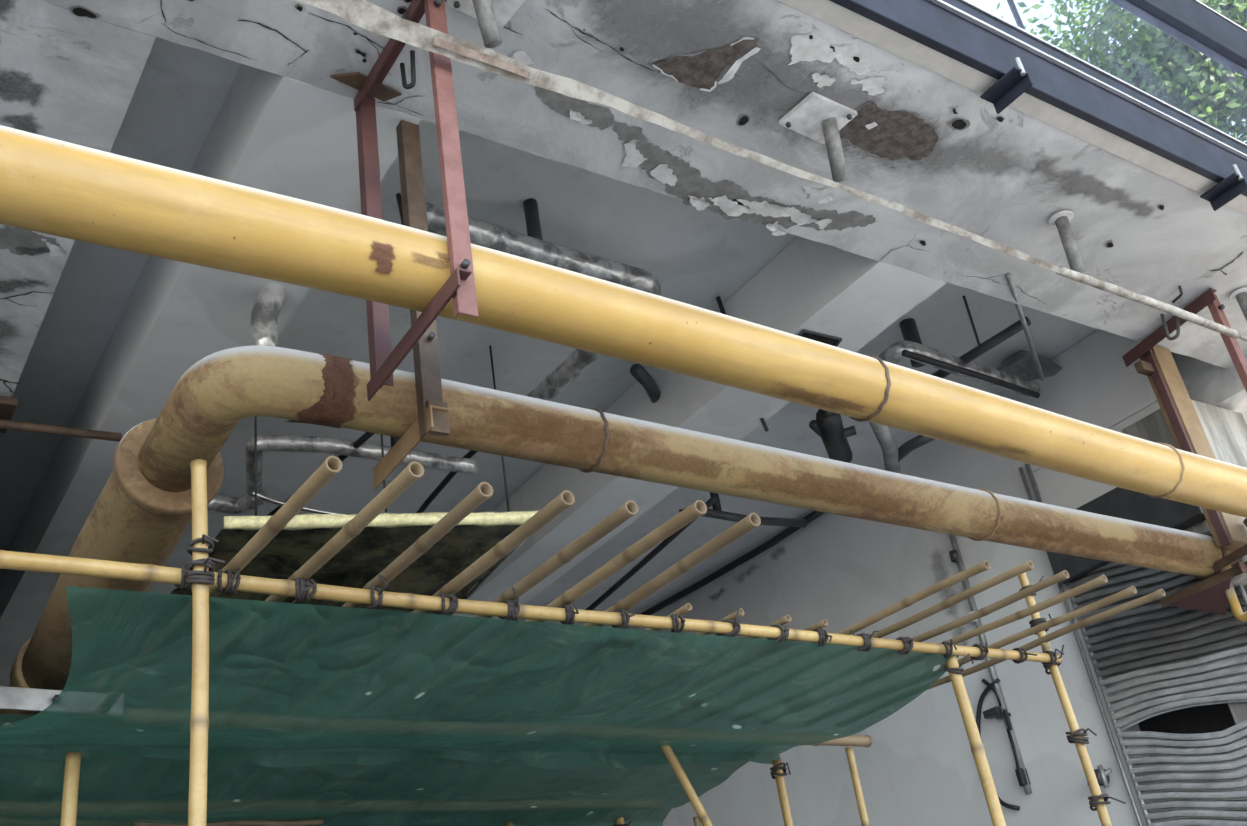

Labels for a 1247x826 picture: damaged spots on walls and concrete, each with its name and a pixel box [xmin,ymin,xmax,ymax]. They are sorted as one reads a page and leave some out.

damp [0,0,12,14]
crack [160,0,256,61]
crack [238,20,309,65]
crack [308,13,384,56]
damp [593,0,894,116]
damp [0,71,43,134]
spalling [789,32,970,160]
peeling [433,36,876,236]
damp [839,125,1019,173]
damp [1036,160,1152,216]